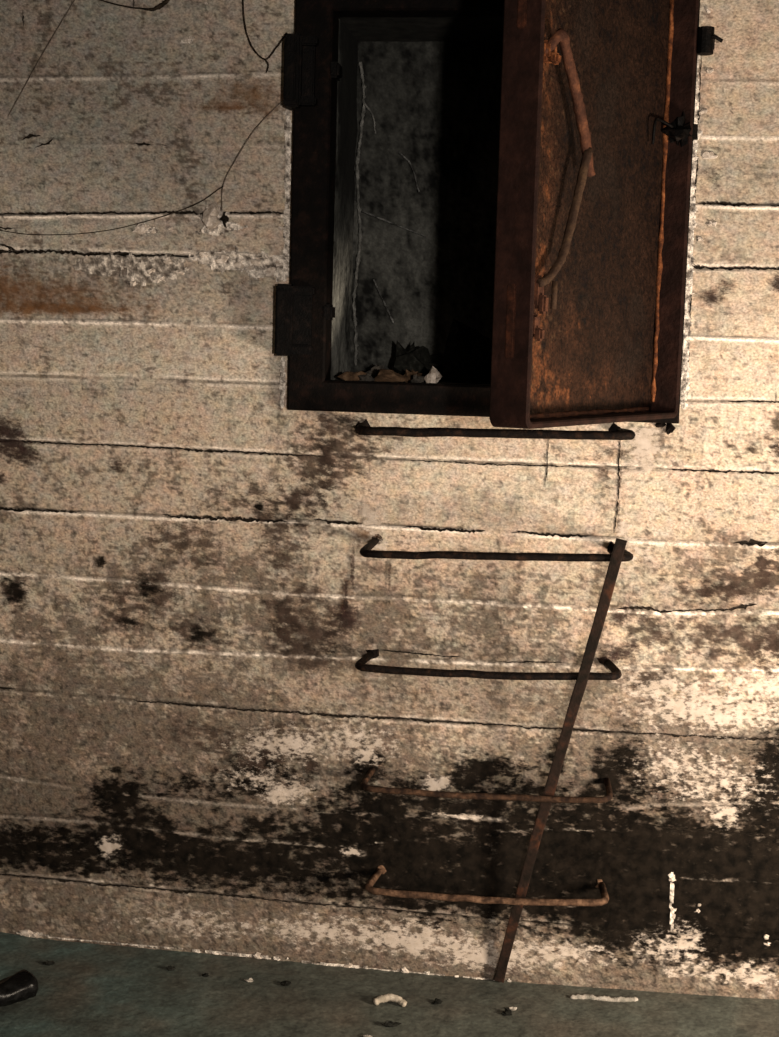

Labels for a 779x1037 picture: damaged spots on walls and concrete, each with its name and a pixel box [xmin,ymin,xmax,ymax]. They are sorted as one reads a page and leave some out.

damp [700,280,735,304]
damp [0,417,39,484]
damp [727,418,779,463]
damp [91,414,400,648]
damp [0,571,29,613]
rust [333,550,360,630]
damp [679,549,779,606]
damp [261,582,350,674]
rust [602,644,639,663]
rust [347,750,388,792]
damp [0,615,779,993]
rust [586,734,636,803]